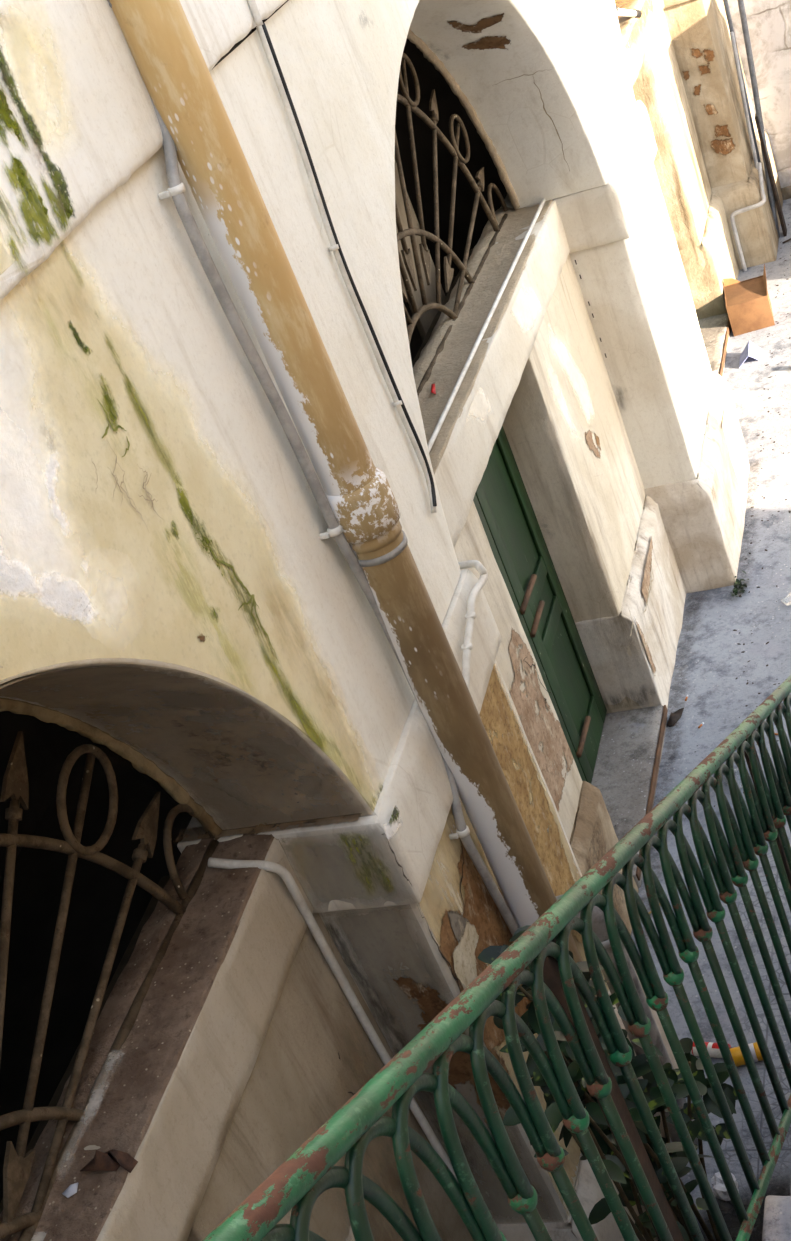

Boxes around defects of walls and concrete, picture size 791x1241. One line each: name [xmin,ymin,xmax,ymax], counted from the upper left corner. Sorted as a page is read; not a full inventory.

peeling [447,13,511,50]
crack [92,442,161,529]
water stain [0,249,376,830]
water stain [291,835,398,904]
peeling [330,806,514,1050]
peeling [571,930,586,961]
peeling [448,1016,580,1220]